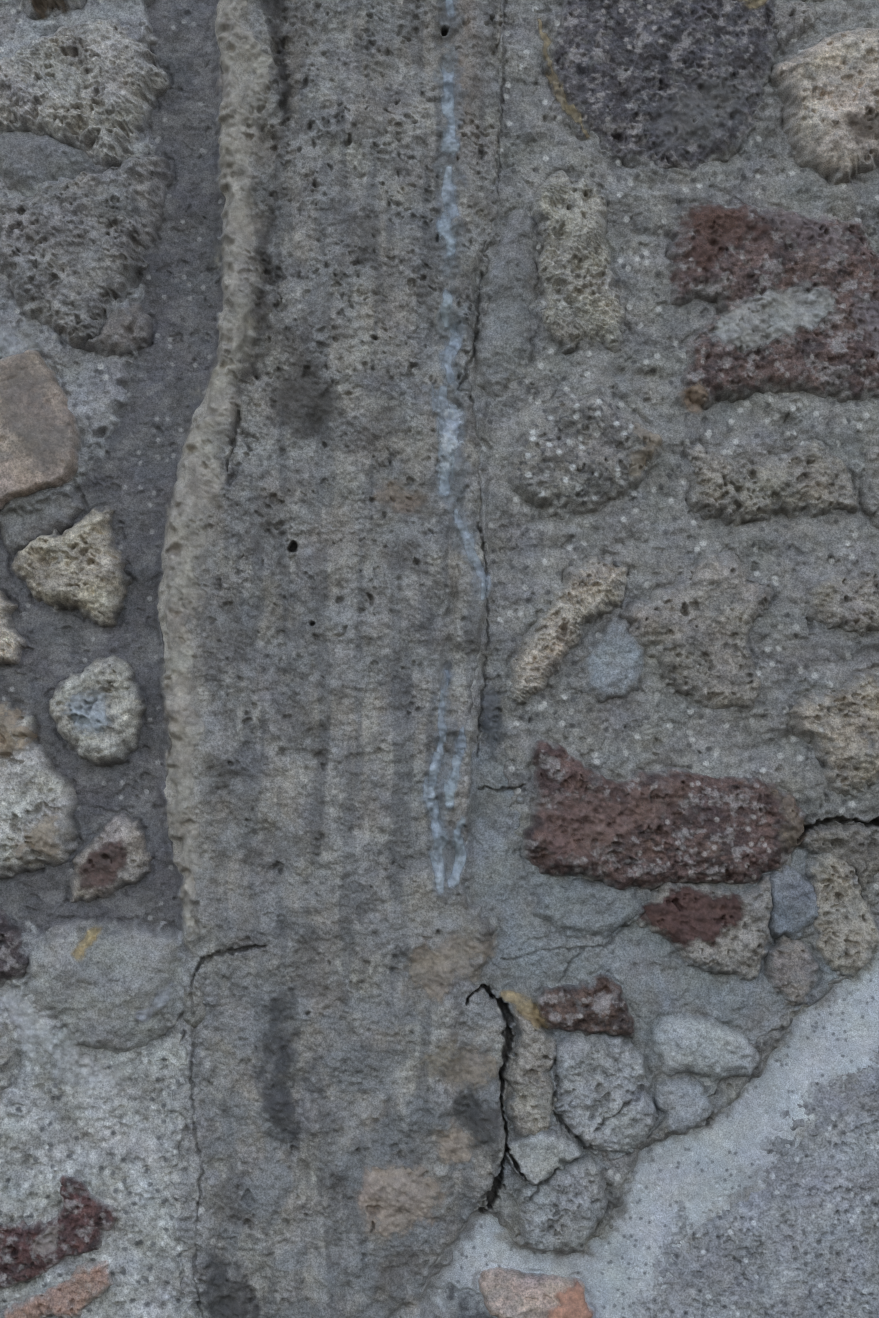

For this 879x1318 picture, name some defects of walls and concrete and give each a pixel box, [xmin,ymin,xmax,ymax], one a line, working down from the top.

crack [466,984,525,1208]